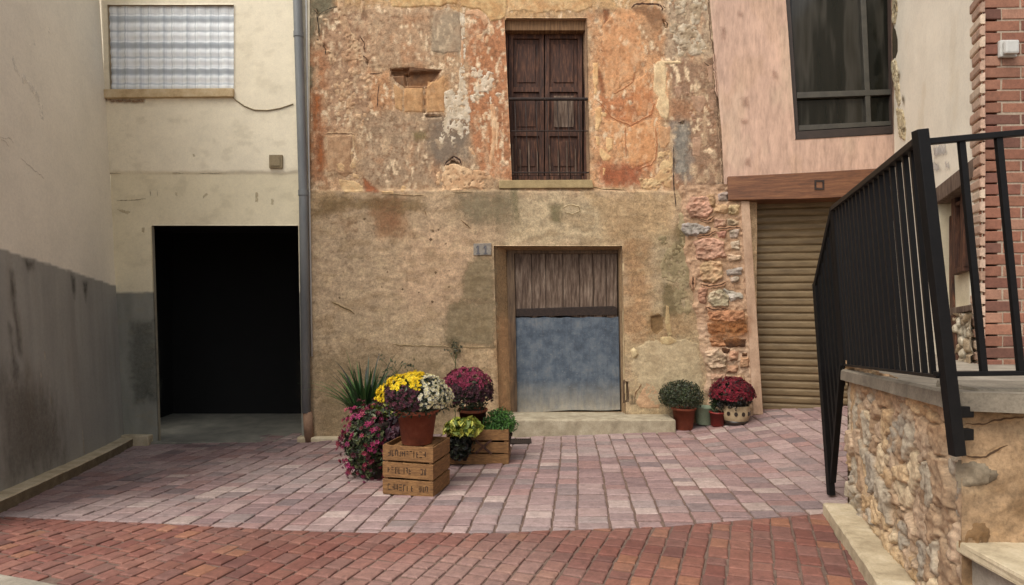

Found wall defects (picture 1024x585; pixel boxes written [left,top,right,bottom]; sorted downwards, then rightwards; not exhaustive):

peeling [390,0,593,191]
crack [965,413,1024,460]
flaking render [955,460,999,488]